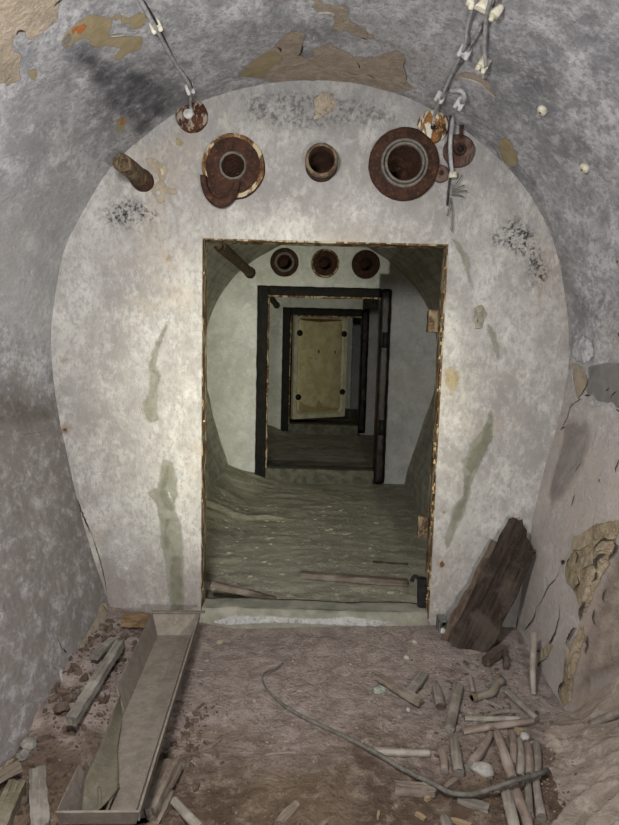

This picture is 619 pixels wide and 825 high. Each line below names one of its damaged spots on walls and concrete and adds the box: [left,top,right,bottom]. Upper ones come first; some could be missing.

peeling [0,0,62,86]
peeling [62,13,146,60]
peeling [238,31,412,92]
peeling [312,0,374,40]
corrosion [202,133,264,198]
corrosion [305,143,338,178]
mould [498,222,545,281]
leakage [141,326,166,421]
leakage [446,415,492,547]
leakage [149,460,184,610]
spalling [558,520,619,707]